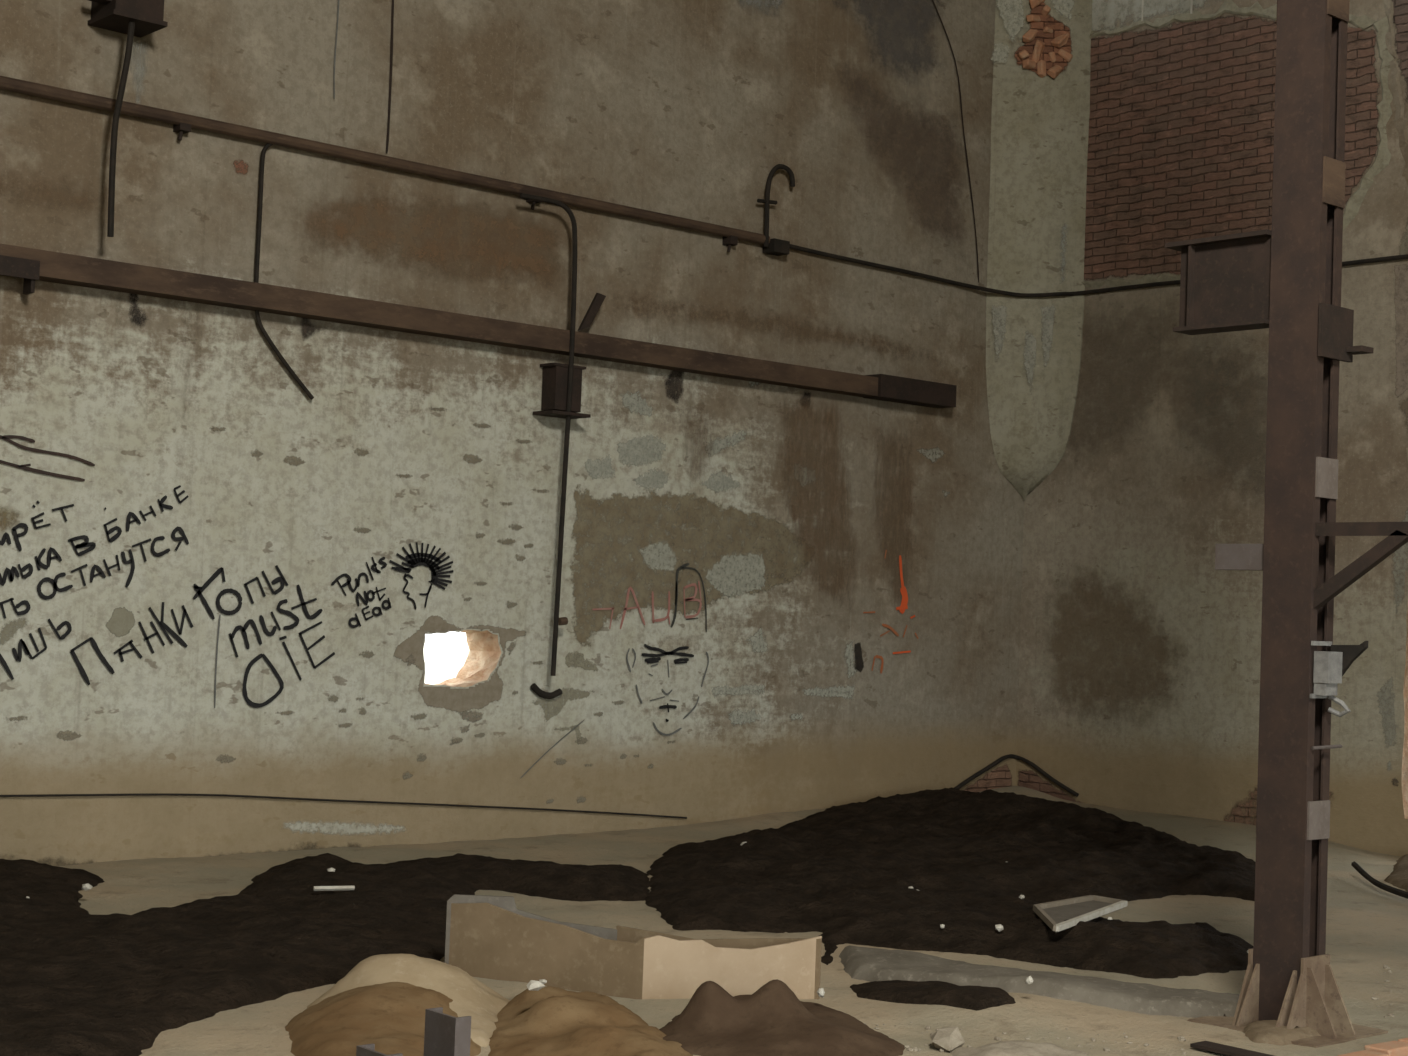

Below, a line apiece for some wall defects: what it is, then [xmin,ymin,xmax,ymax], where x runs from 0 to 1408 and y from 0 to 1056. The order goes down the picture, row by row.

flaking render [991,0,1074,79]
flaking render [1343,0,1408,231]
flaking render [1081,0,1277,290]
spalling [665,370,683,403]
peeling [284,456,305,466]
peeling [463,454,482,464]
peeling [476,525,533,561]
peeling [565,435,815,671]
flaking render [393,616,526,745]
peeling [803,643,864,700]
peeling [329,695,366,728]
peeling [534,687,590,744]